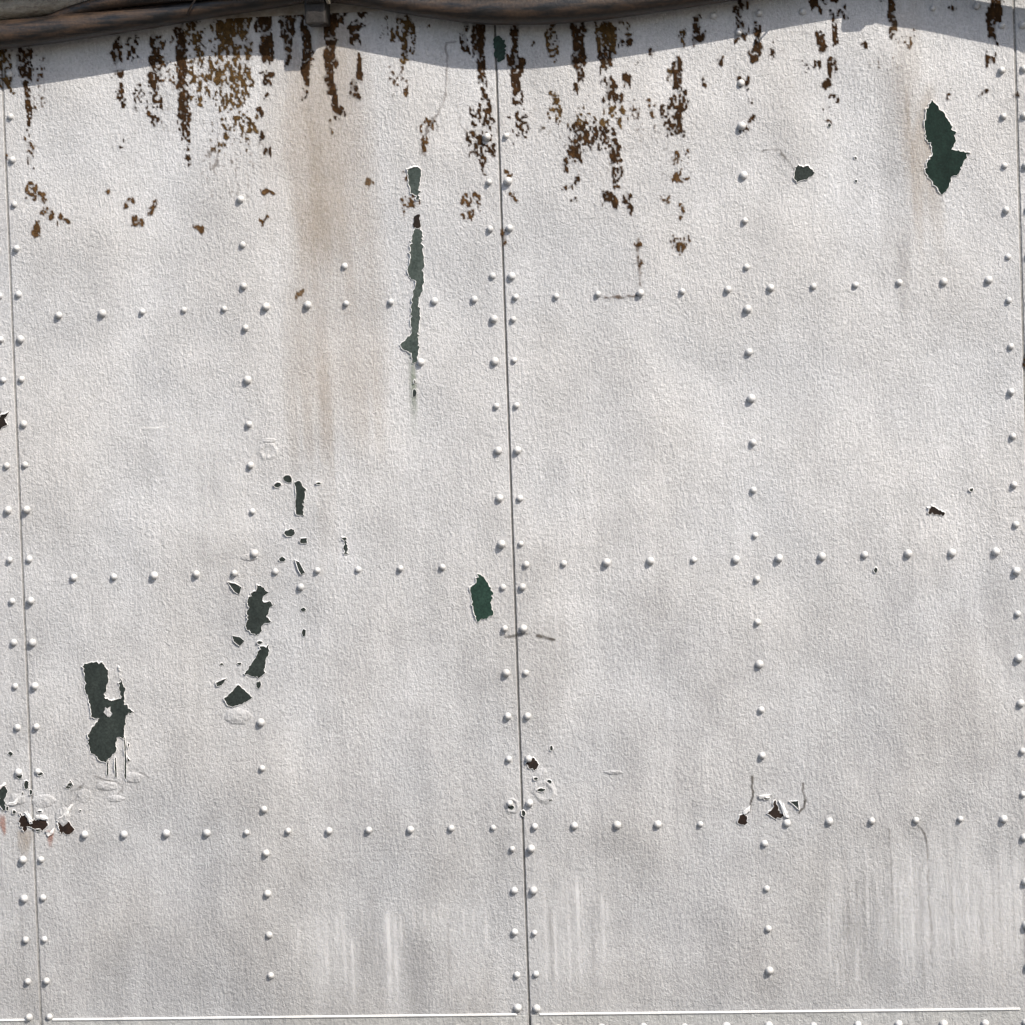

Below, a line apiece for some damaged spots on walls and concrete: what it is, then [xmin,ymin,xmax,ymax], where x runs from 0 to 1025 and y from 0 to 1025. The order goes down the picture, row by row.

corrosion [0,48,71,238]
corrosion [110,12,367,166]
corrosion [460,24,496,176]
corrosion [506,25,529,145]
corrosion [532,14,706,216]
corrosion [802,0,849,125]
peeling [923,99,971,195]
peeling [399,214,425,364]
peeling [215,581,274,708]
peeling [468,573,494,622]
peeling [81,661,134,782]
peeling [0,772,82,836]